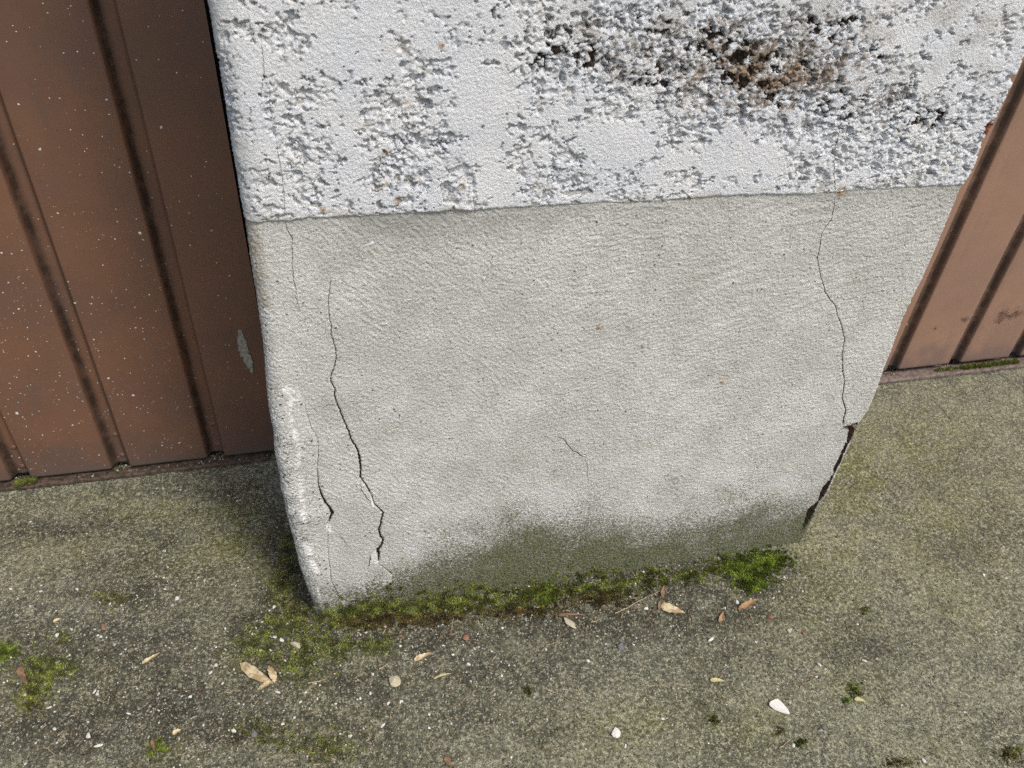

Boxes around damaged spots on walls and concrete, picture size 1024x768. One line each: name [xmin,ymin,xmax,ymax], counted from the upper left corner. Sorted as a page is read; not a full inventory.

water stain [527,18,599,75]
water stain [617,55,684,92]
water stain [680,14,884,123]
water stain [895,84,962,142]
crack [817,124,846,423]
water stain [282,385,321,574]
crack [305,281,392,594]